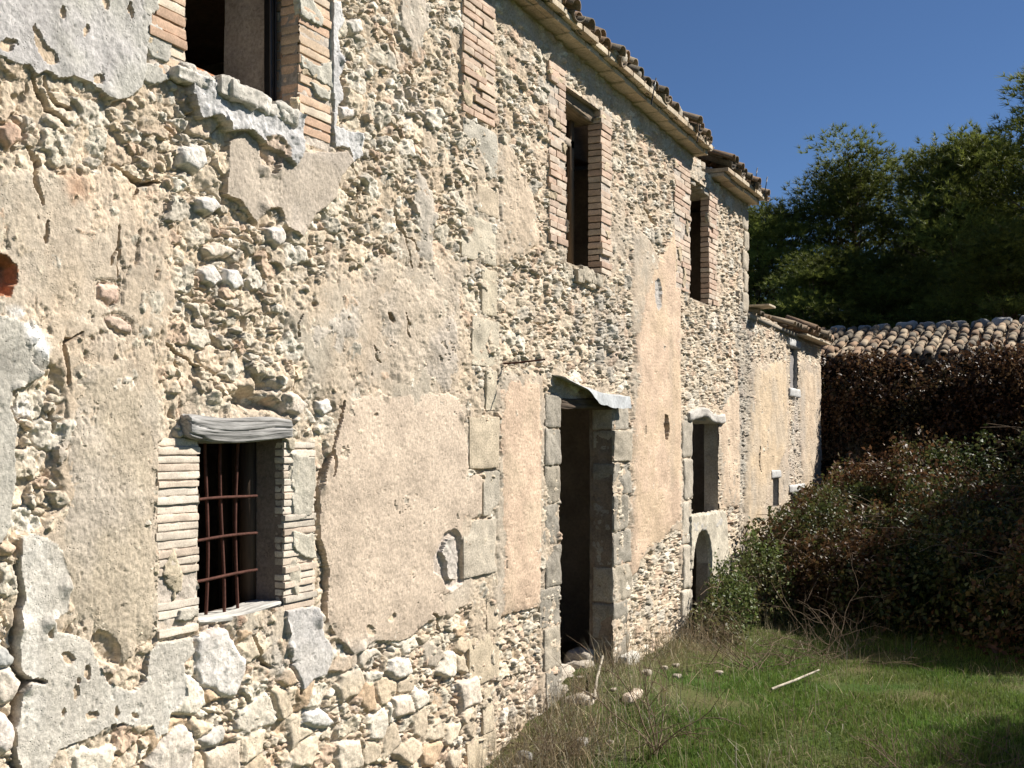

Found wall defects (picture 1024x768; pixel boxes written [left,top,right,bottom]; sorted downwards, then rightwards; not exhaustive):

spalling [0,0,464,408]
spalling [0,274,484,768]
spalling [495,18,630,749]
peeling [610,108,817,660]